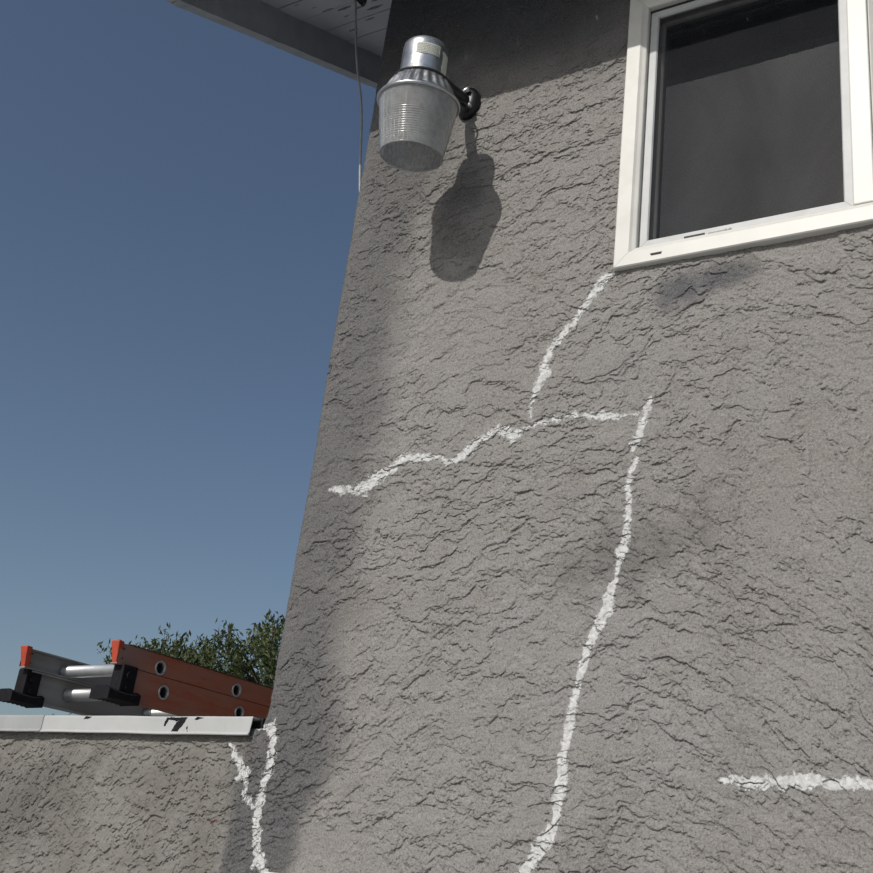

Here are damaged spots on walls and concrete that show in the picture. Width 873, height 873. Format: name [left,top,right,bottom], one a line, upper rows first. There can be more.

crack [329,273,654,873]
crack [228,719,278,873]
crack [718,769,873,792]